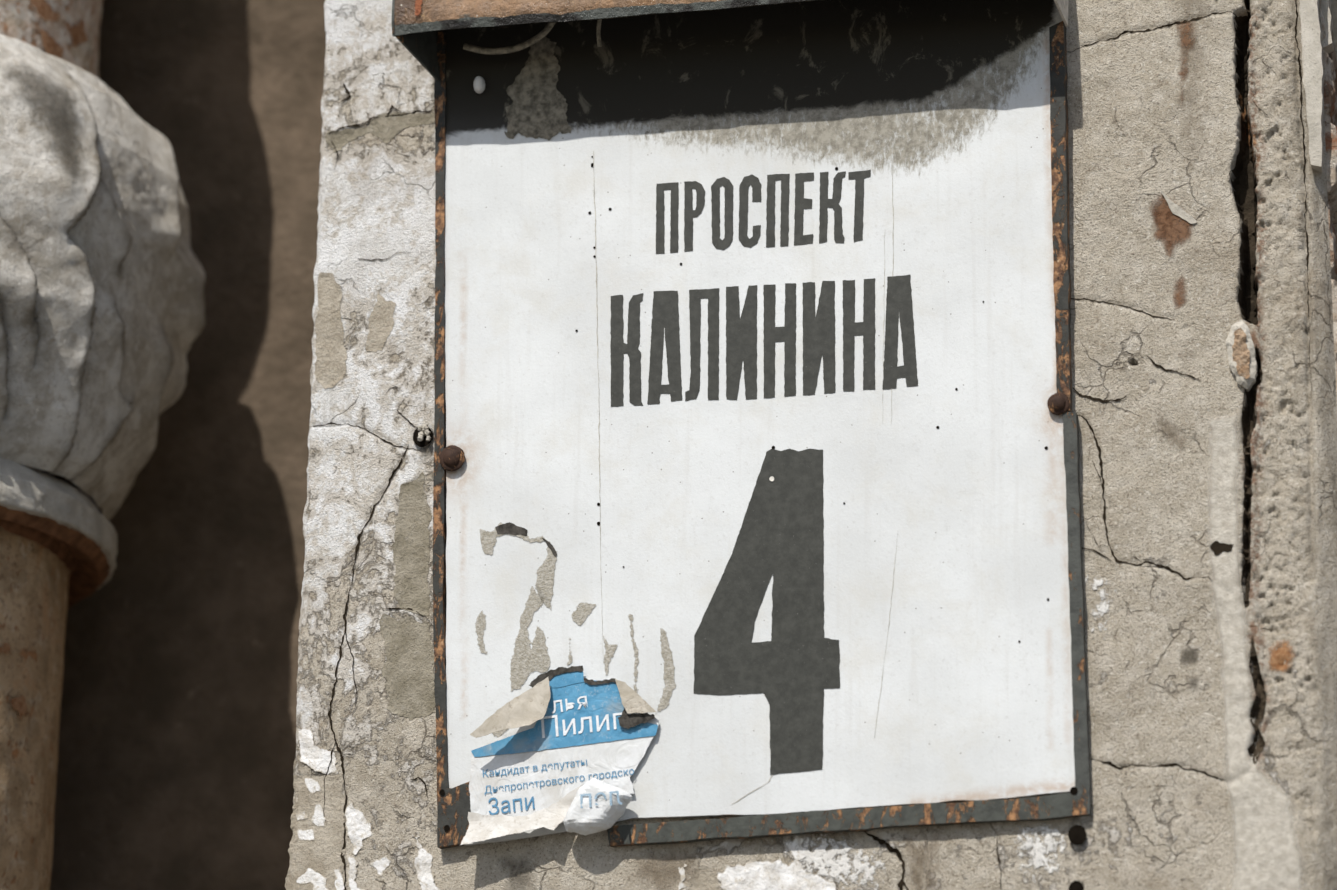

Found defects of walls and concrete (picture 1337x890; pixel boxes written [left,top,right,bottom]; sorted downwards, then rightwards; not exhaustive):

rust [1152,191,1197,255]
crack [1295,0,1312,398]
rust [1174,280,1185,307]
crack [1067,0,1266,764]
crack [313,410,420,890]
crack [1091,758,1227,782]
peeling [285,728,391,890]
peeling [412,835,441,890]
peeling [678,864,689,890]
peeling [717,837,836,890]
crack [865,832,909,890]